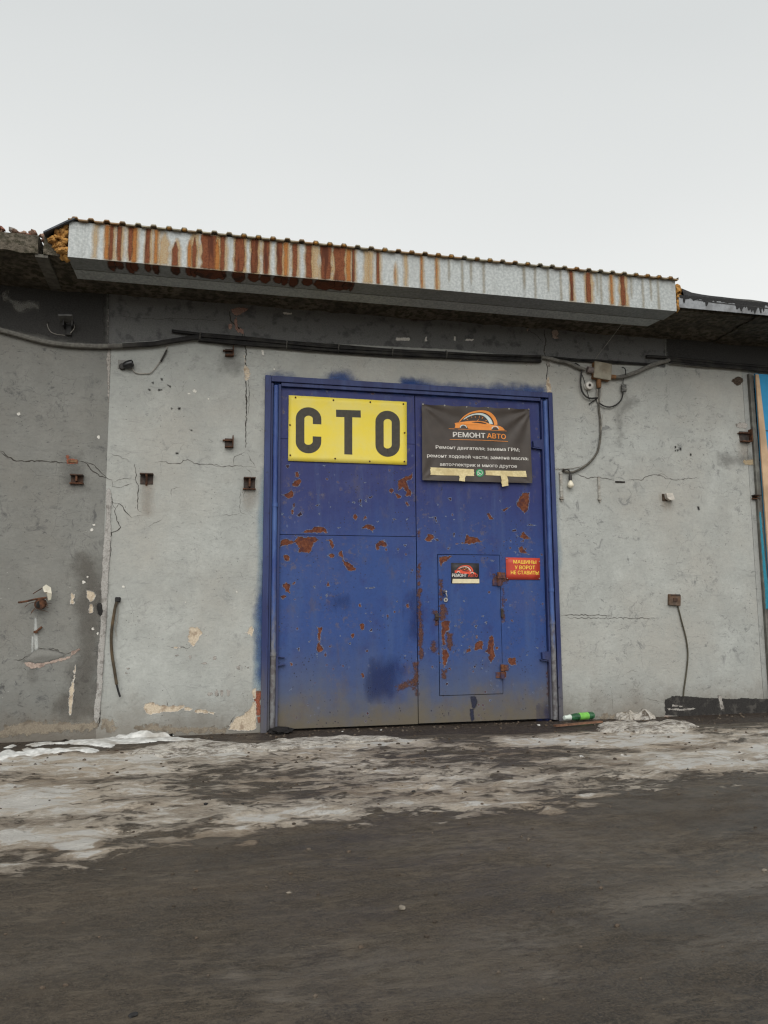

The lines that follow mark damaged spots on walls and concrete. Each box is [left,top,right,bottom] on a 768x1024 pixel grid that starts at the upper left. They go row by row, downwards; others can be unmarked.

corrosion [94,225,381,291]
corrosion [421,256,440,289]
corrosion [569,271,593,302]
corrosion [610,275,628,305]
crack [160,311,254,490]
crack [2,451,159,556]
corrosion [389,472,413,507]
corrosion [280,526,356,571]
corrosion [353,514,387,550]
peeling [70,576,96,613]
corrosion [395,563,453,696]
spalling [134,688,261,734]